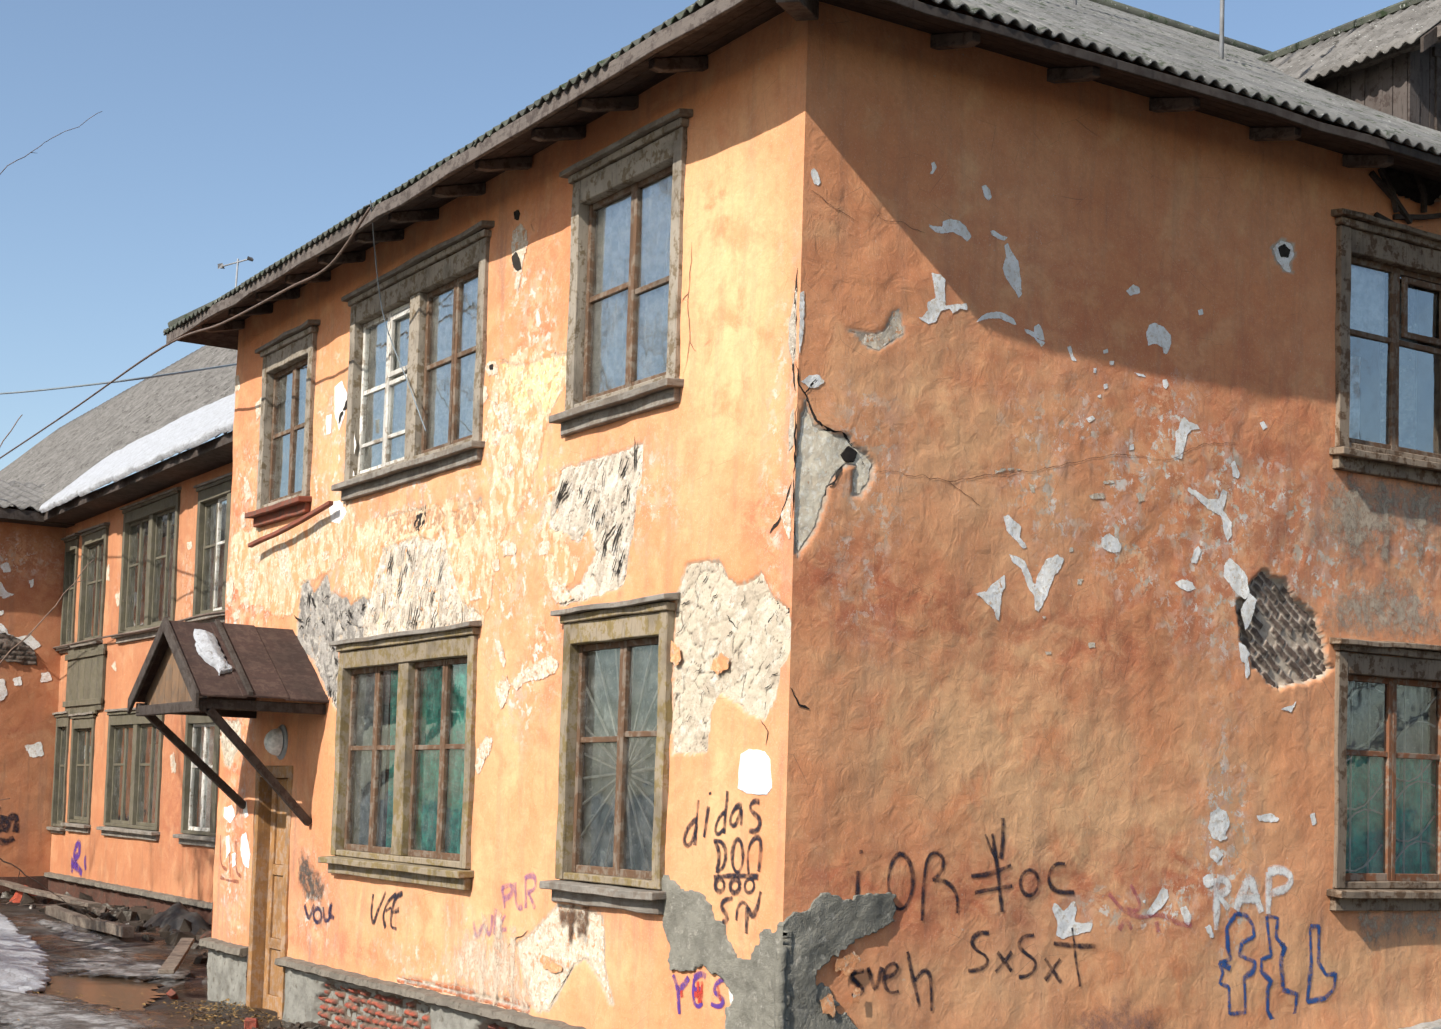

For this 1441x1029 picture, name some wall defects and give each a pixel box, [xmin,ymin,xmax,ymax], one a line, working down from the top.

peeling [919,273,1045,347]
peeling [1146,323,1171,354]
crack [770,268,1223,542]
spalling [0,562,52,701]
peeling [226,346,644,709]
spalling [670,561,791,753]
crack [790,687,809,709]
spalling [781,409,871,551]
peeling [975,515,1073,620]
peeling [1187,461,1240,541]
spalling [1224,558,1326,689]
flaking render [317,904,612,1029]